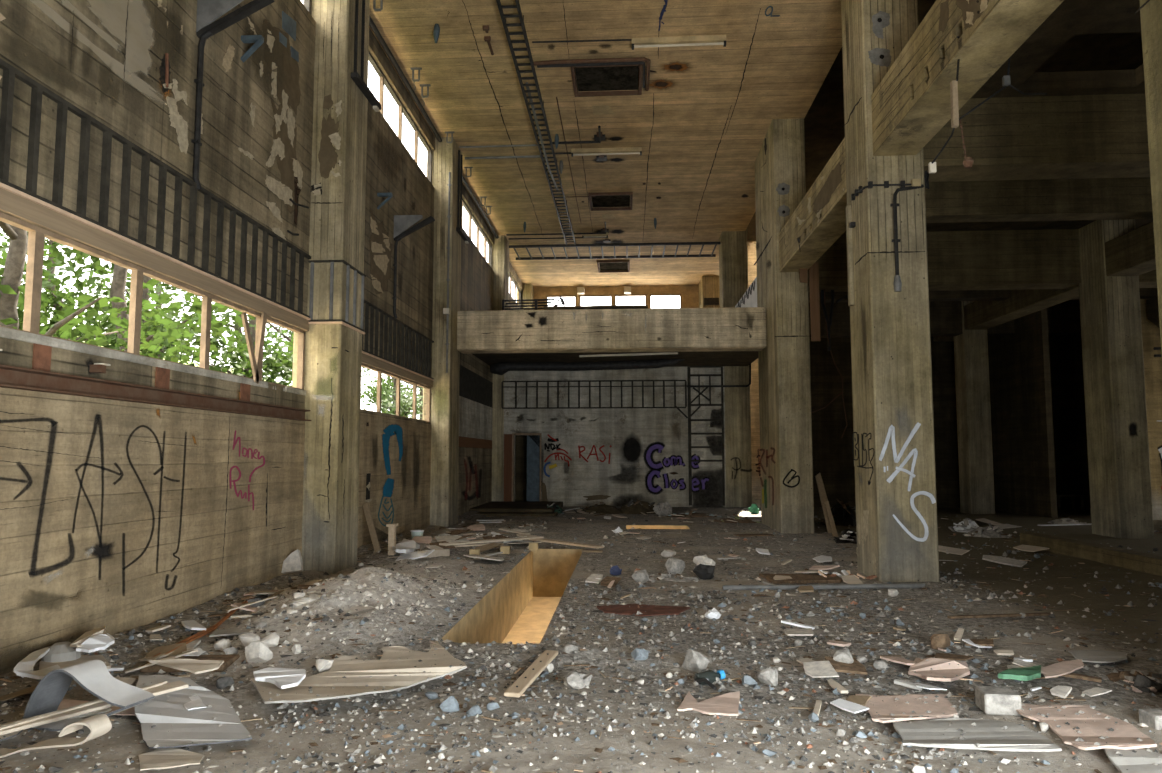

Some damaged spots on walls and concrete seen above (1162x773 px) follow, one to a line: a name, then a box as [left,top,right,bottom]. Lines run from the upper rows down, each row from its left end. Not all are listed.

peeling [159,53,203,154]
peeling [238,17,342,249]